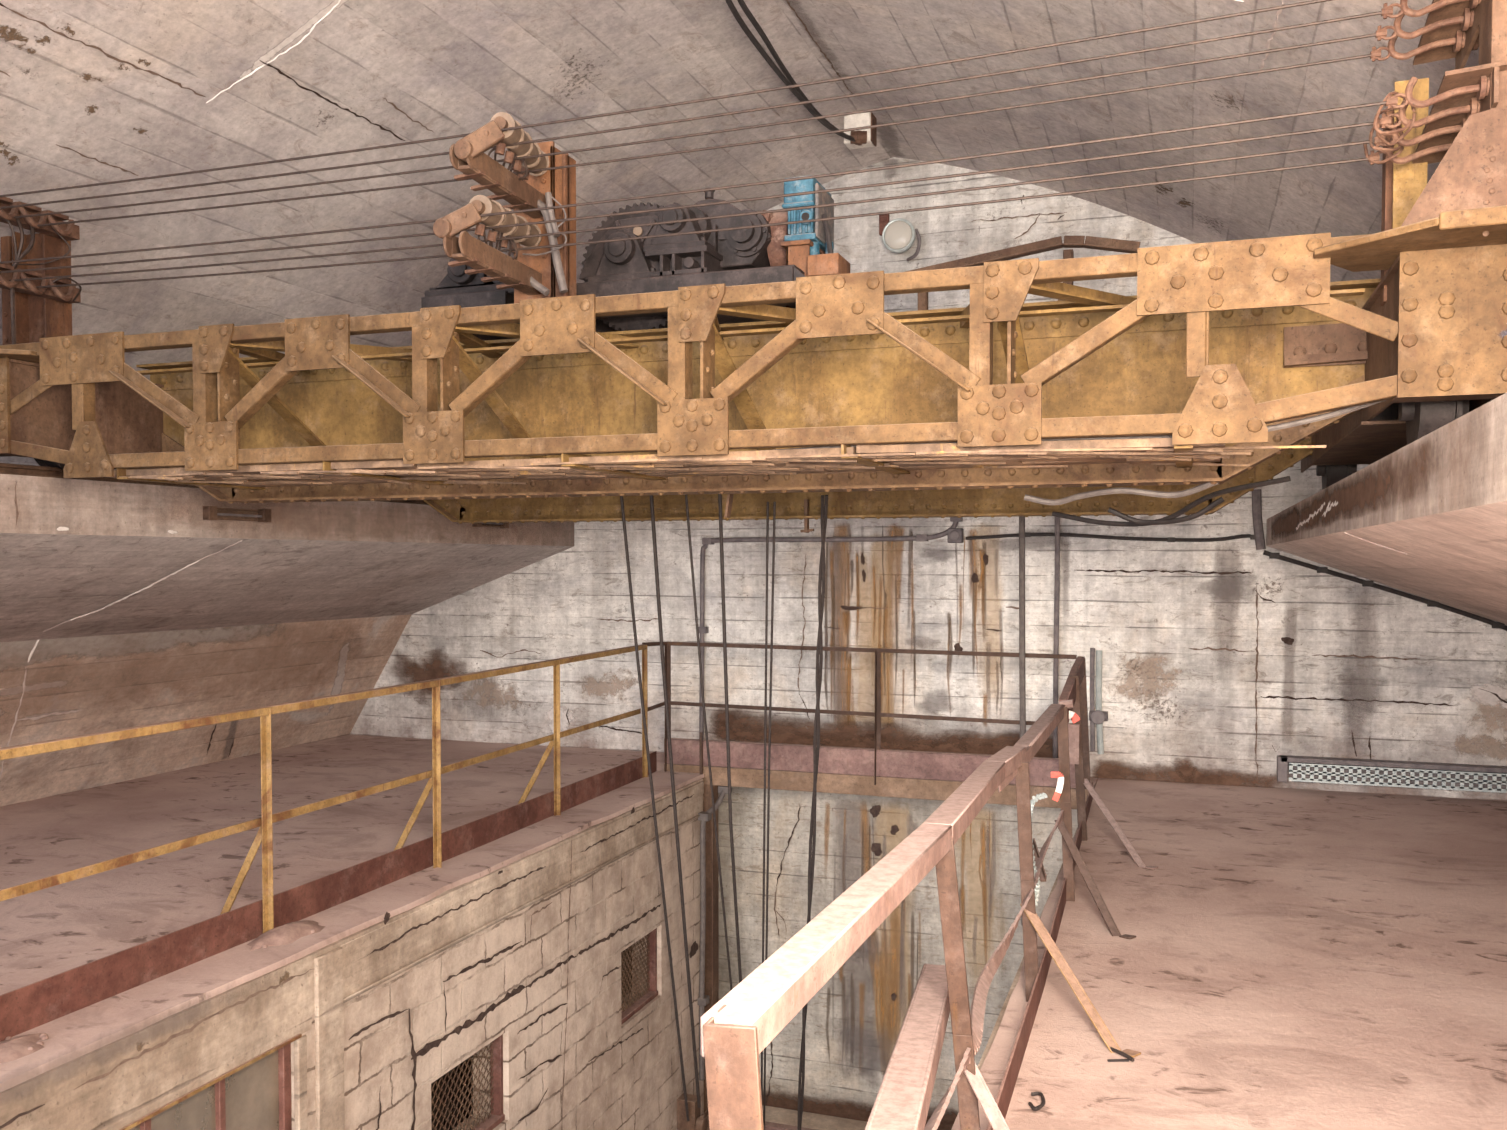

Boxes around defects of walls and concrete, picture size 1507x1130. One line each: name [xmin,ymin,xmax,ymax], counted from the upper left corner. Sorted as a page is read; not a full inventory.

crack [0,0,433,141]
crack [786,0,852,93]
crack [1235,0,1283,77]
crack [56,144,138,176]
corrosion [824,526,916,725]
leakage [395,651,462,701]
corrosion [825,805,870,877]
crack [349,794,694,1130]
corrosion [826,899,920,1071]